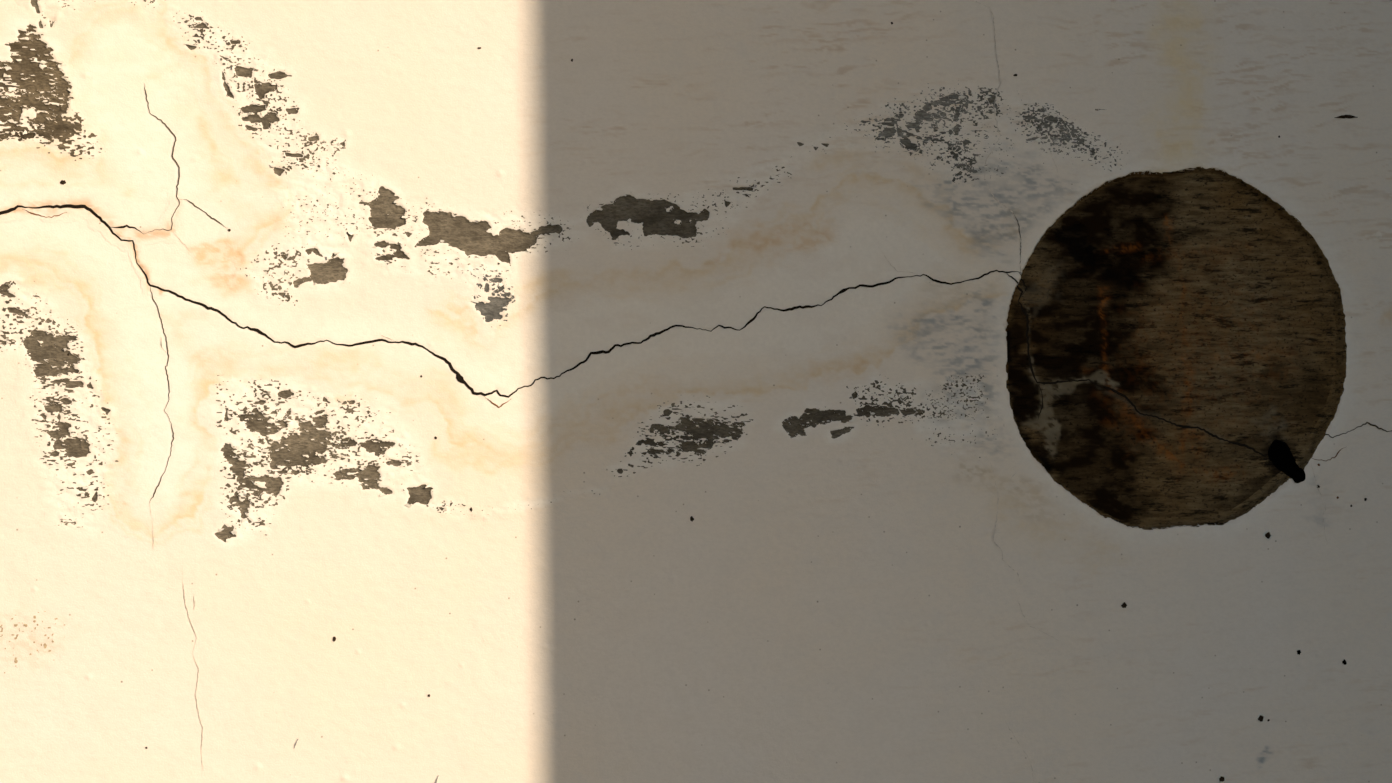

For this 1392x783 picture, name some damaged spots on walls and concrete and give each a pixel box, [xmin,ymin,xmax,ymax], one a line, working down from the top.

peeling [0,260,130,549]
peeling [0,0,790,346]
water stain [0,0,1066,551]
peeling [197,364,1003,553]
crack [0,0,1269,550]
peeling [801,72,1124,188]